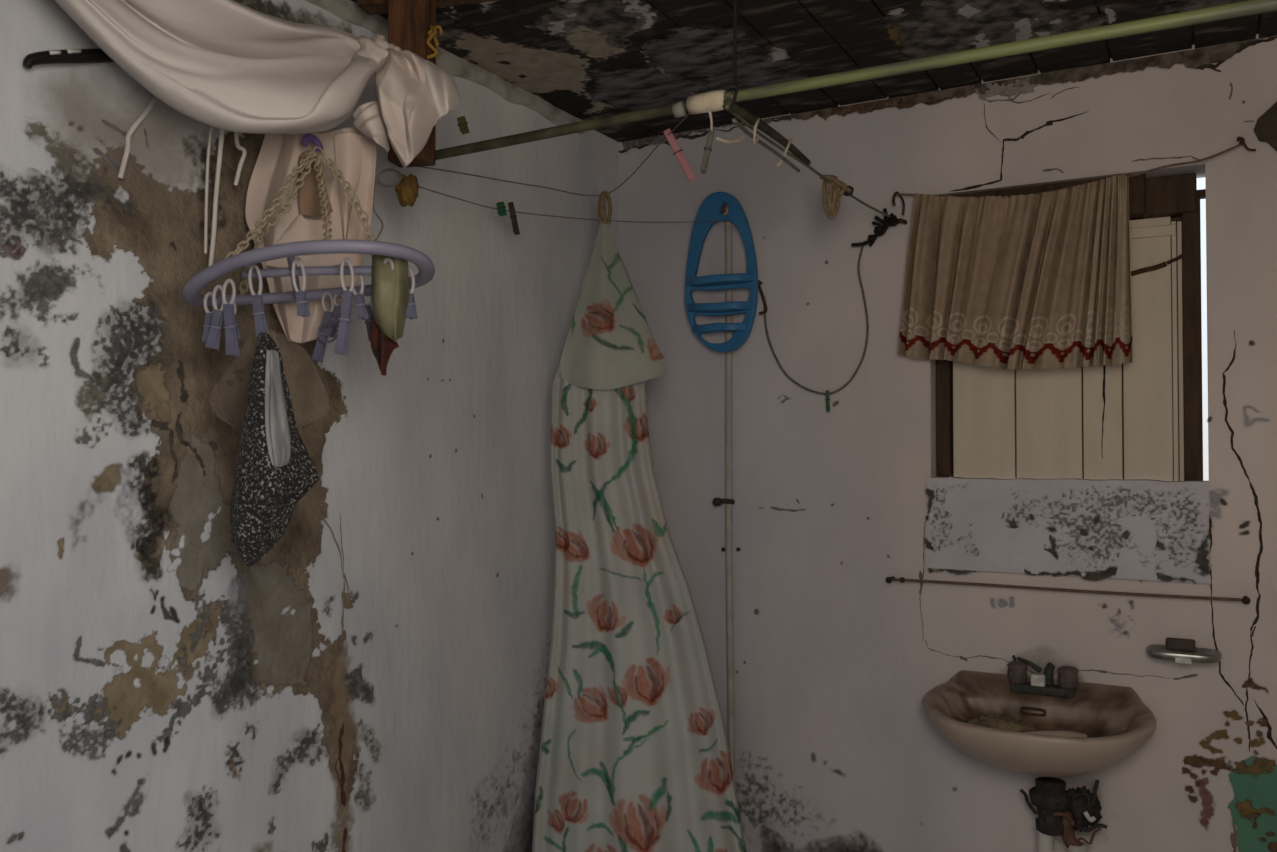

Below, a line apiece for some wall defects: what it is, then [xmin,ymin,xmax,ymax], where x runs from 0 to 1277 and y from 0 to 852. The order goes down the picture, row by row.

peeling [436,0,808,151]
peeling [883,0,1116,60]
spalling [761,36,1274,123]
crack [949,87,1088,192]
crack [1131,155,1200,163]
damp [0,123,136,367]
damp [70,302,164,448]
flaking render [48,131,360,801]
crack [919,521,1036,674]
crack [1081,330,1277,752]
damp [483,785,535,852]
damp [737,765,804,852]